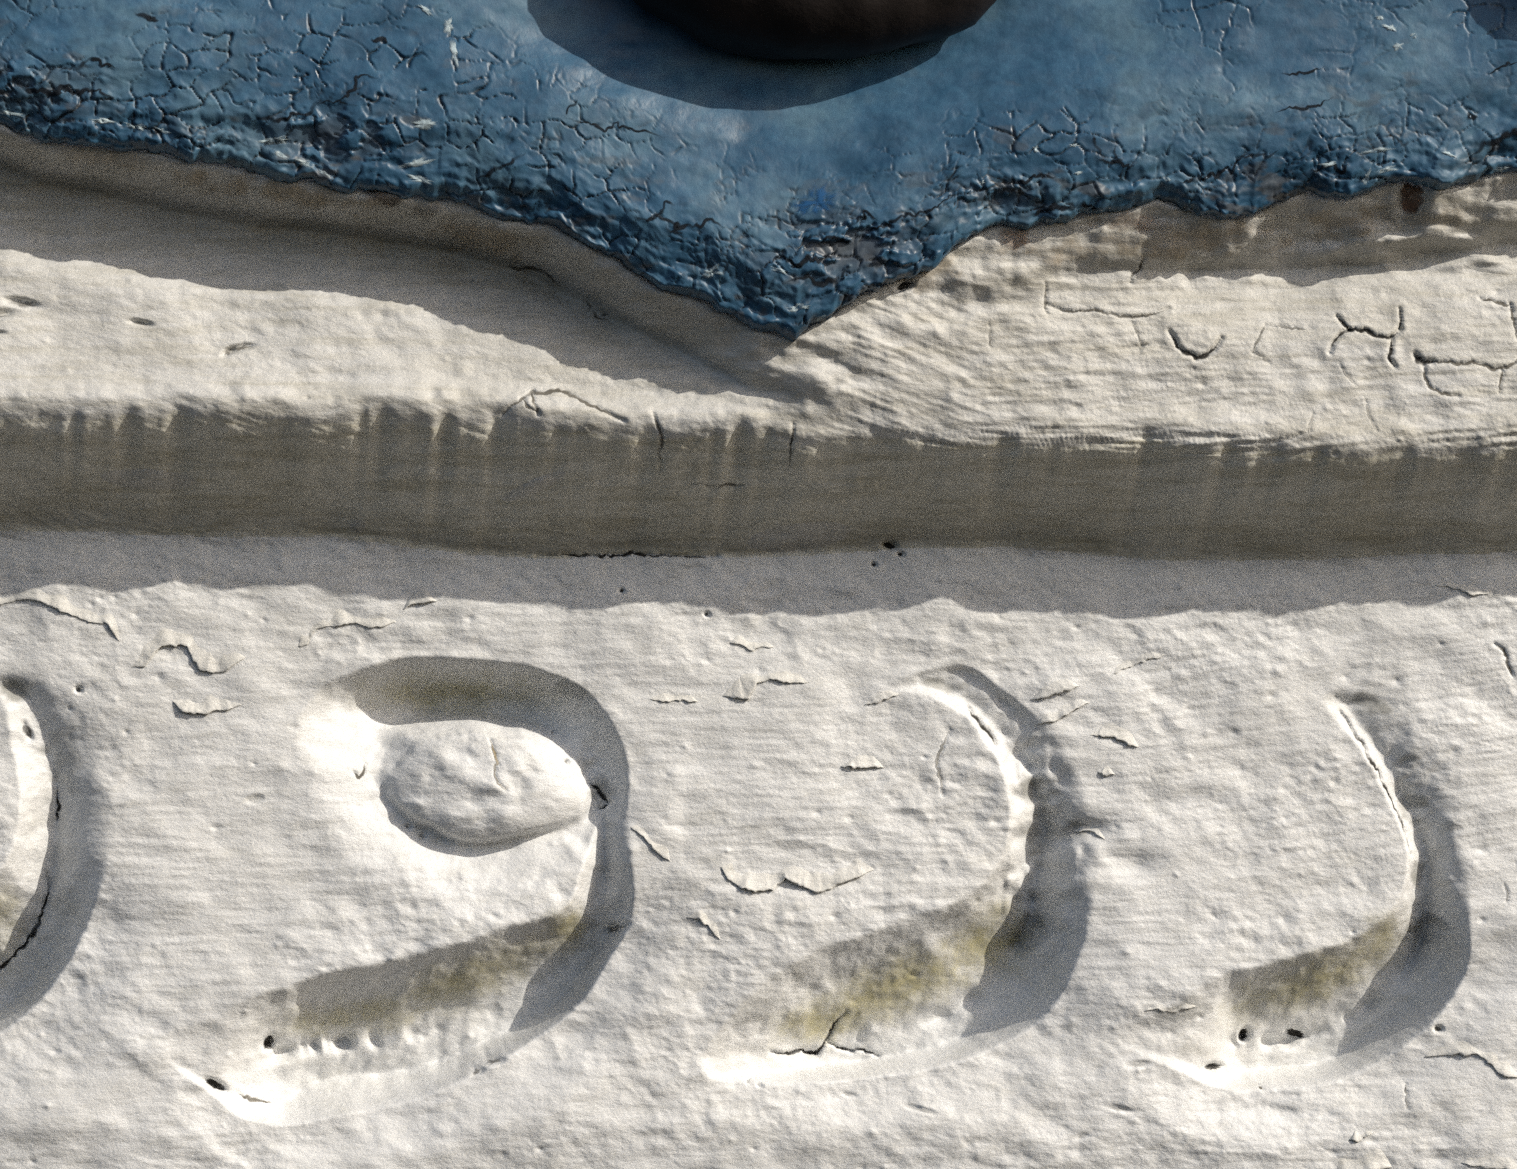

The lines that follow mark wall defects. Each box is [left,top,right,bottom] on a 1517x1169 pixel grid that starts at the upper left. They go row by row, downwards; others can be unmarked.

crack [7,57,115,98]
crack [256,36,387,123]
crack [1282,68,1330,110]
crack [566,101,657,135]
crack [1468,113,1517,152]
crack [1182,153,1273,183]
crack [1009,173,1096,216]
crack [639,200,720,234]
crack [773,195,953,287]
crack [1044,285,1217,360]
crack [1254,298,1517,425]
crack [514,388,614,417]